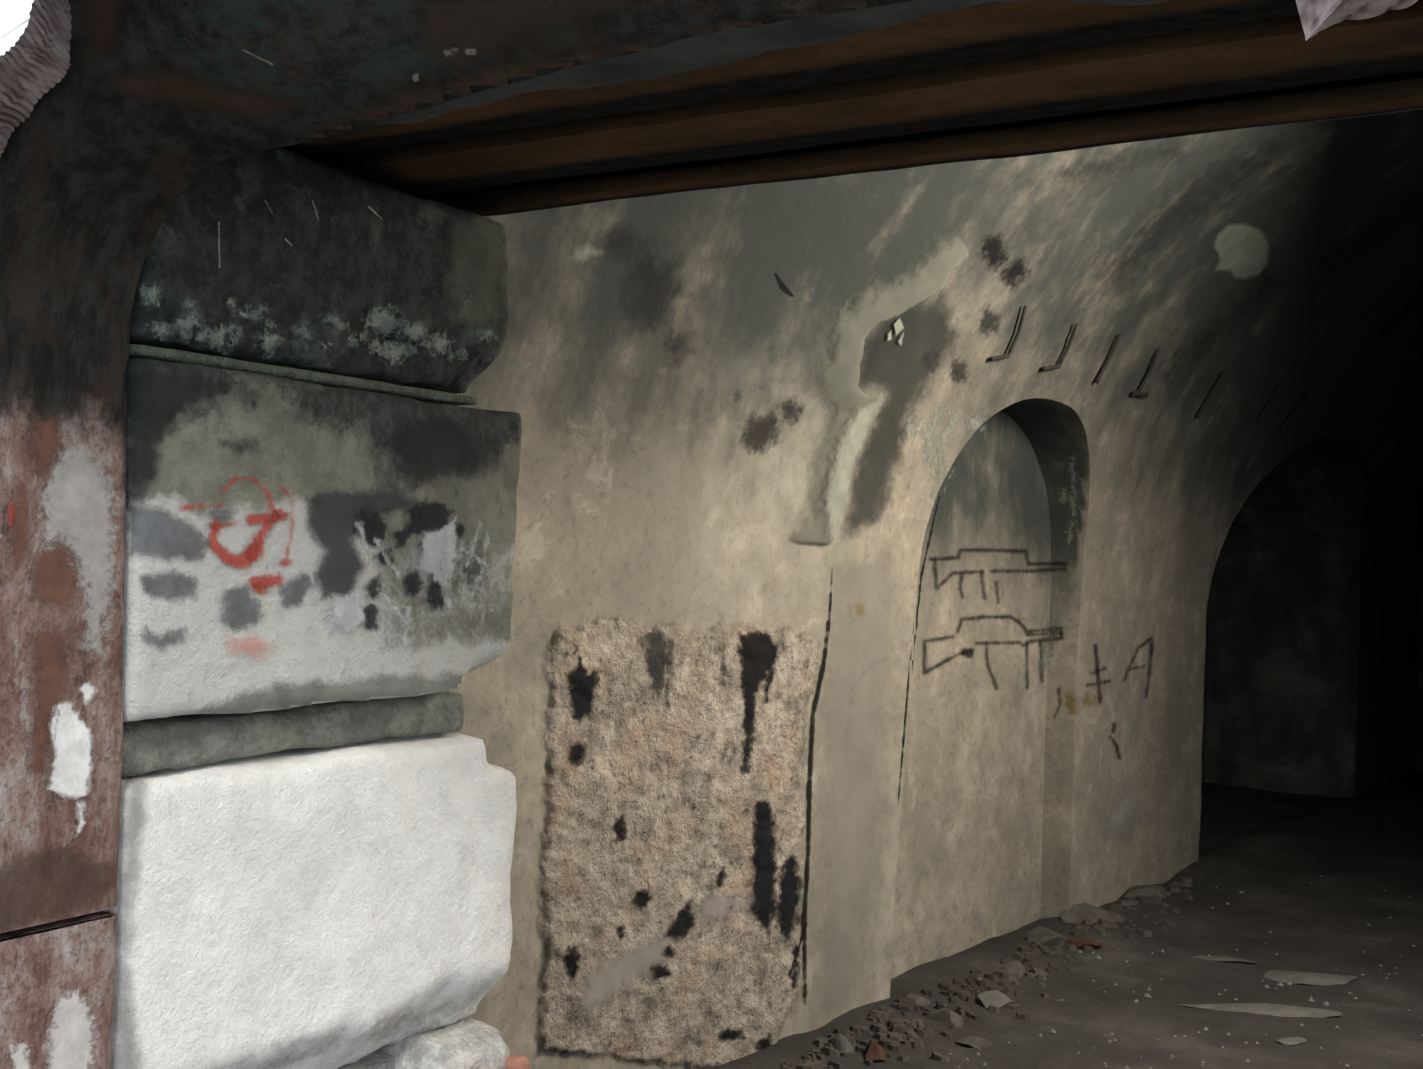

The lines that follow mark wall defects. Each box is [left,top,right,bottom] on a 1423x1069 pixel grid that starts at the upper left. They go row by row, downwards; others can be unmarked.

rust [9,483,76,607]
rust [31,626,65,772]
peeling [49,683,95,832]
damp [569,743,587,766]
damp [741,651,777,773]
rust [0,781,142,941]
spalling [538,617,822,1069]
damp [774,857,803,988]
peeling [9,990,95,1069]
rust [114,973,138,1069]
spalling [505,1055,530,1069]